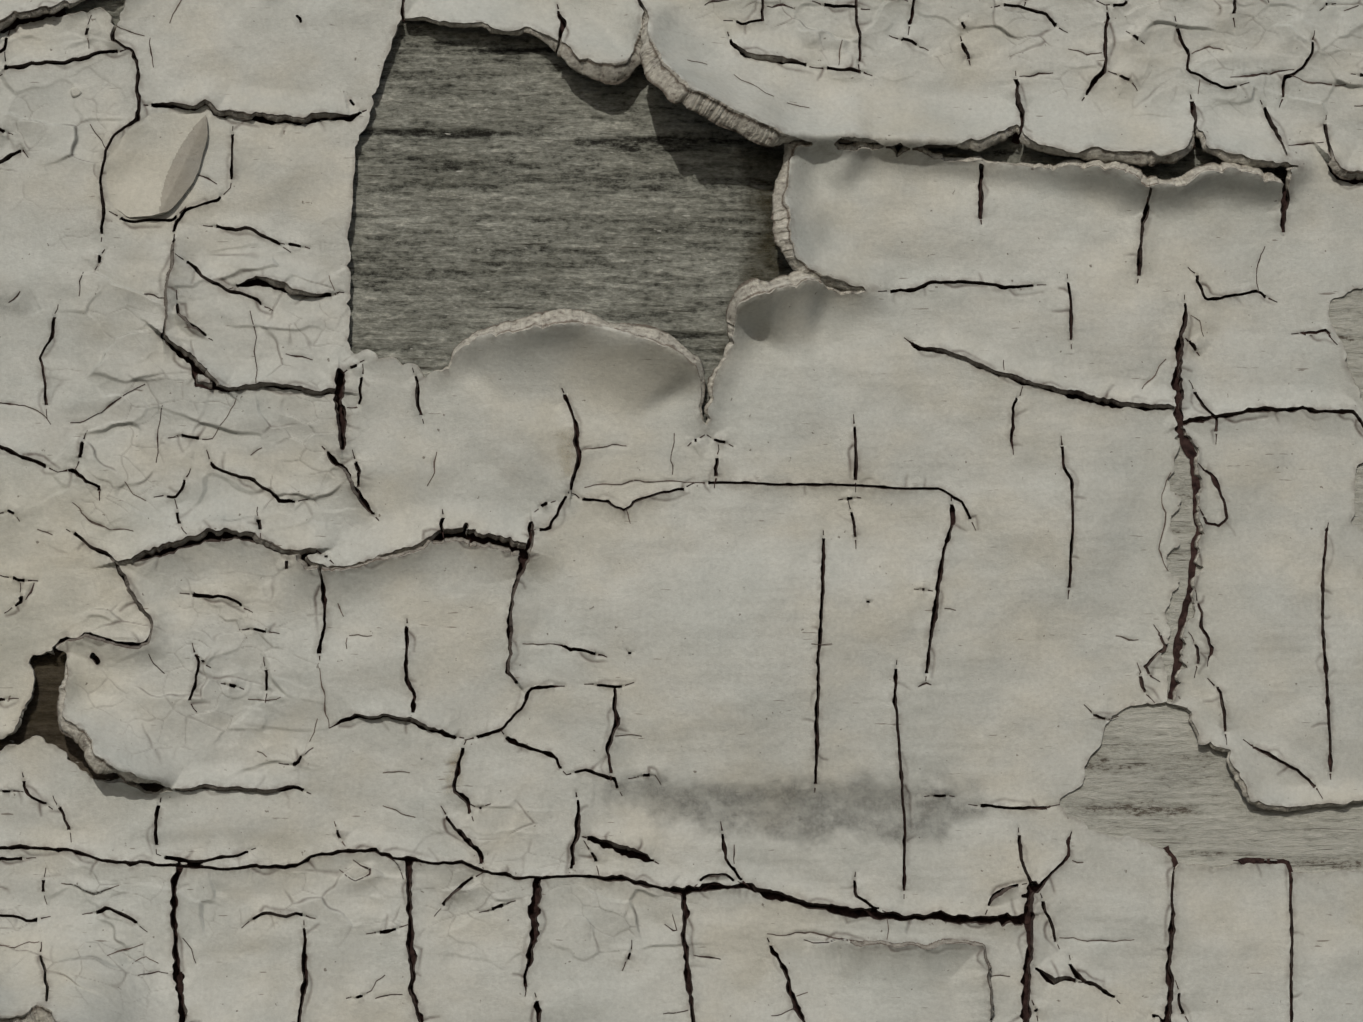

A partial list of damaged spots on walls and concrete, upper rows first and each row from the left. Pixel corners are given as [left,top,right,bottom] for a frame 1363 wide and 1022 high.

crack [689,0,929,108]
crack [991,0,1145,144]
crack [1174,2,1363,184]
crack [0,0,379,581]
peeling [347,0,1297,511]
peeling [1328,288,1363,400]
crack [976,178,1363,799]
peeling [0,644,206,792]
crack [0,368,1134,1022]
peeling [1059,436,1363,873]
peeling [0,987,221,1022]
peeling [545,956,804,1022]